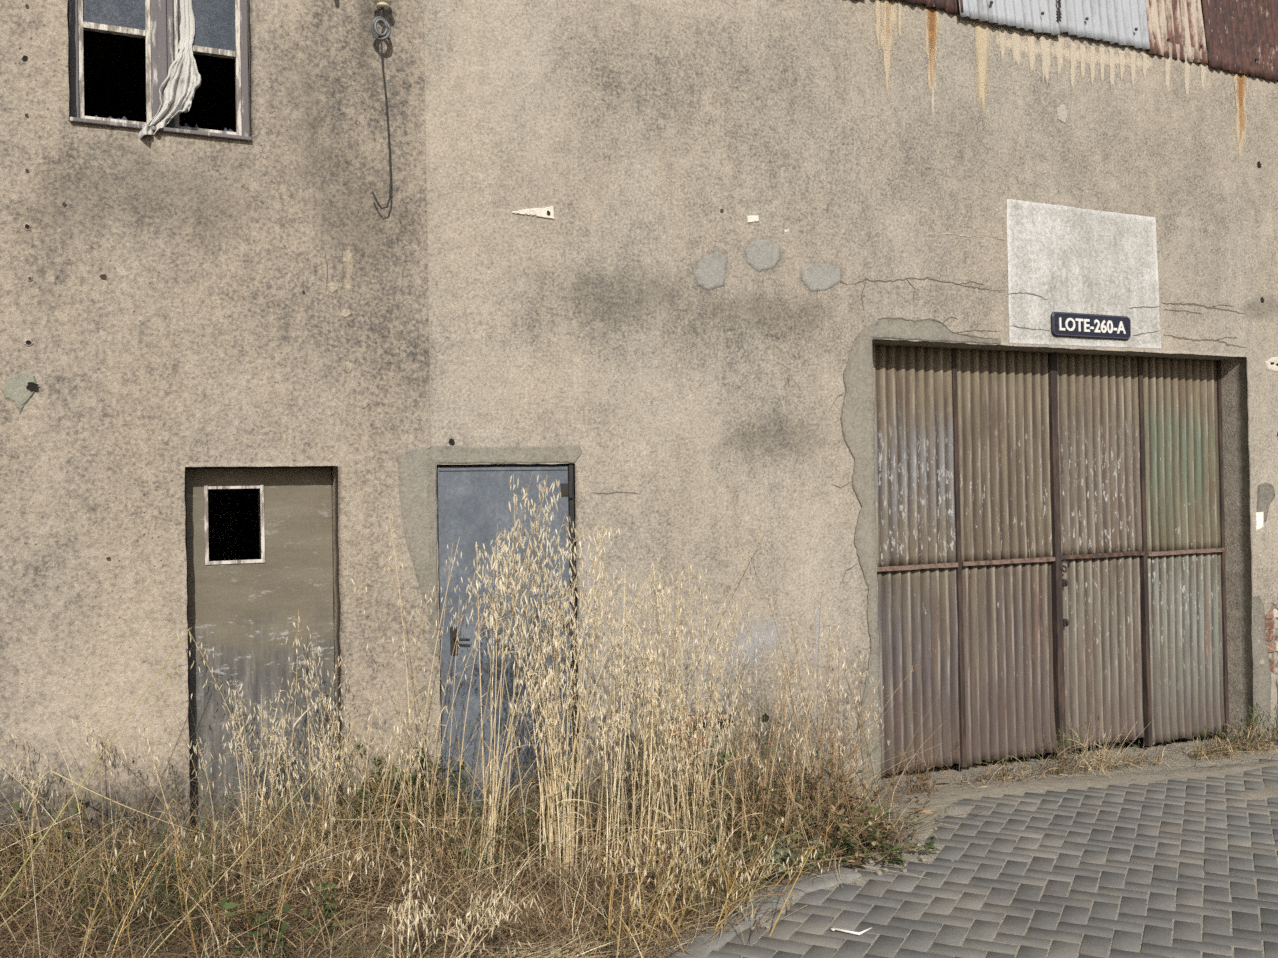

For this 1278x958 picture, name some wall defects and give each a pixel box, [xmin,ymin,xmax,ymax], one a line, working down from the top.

rust [875,0,902,91]
rust [924,4,940,118]
rust [973,19,989,111]
rust [1232,72,1248,162]
crack [1129,302,1247,348]
flaking render [1257,598,1278,741]